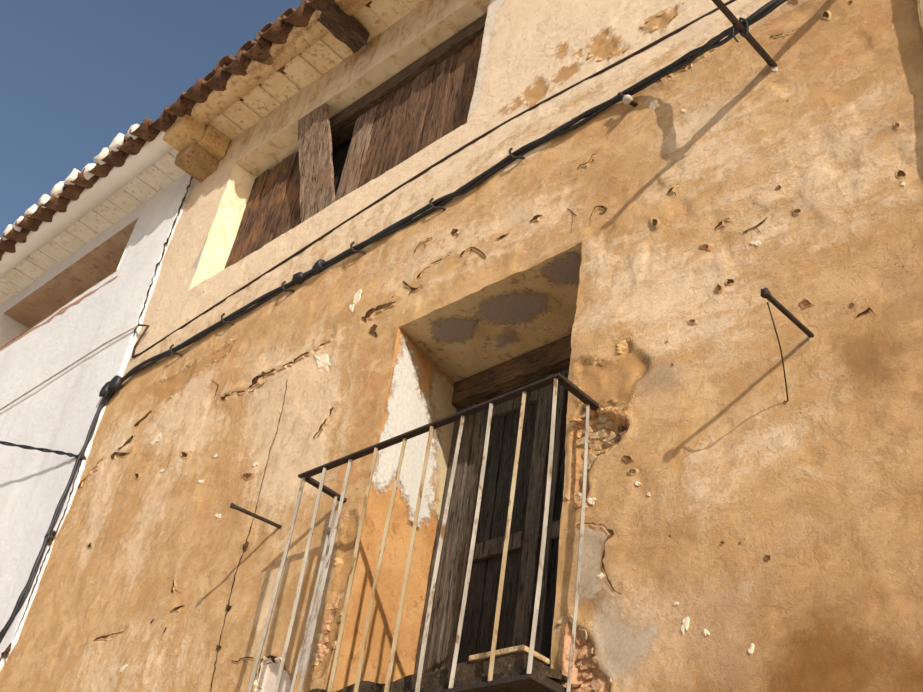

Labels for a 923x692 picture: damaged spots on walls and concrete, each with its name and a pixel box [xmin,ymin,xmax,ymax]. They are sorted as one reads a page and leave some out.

spalling [639,5,679,33]
spalling [499,26,630,115]
peeling [372,339,442,527]
crack [210,338,335,692]
spalling [299,508,361,682]
crack [576,522,622,594]
spalling [253,655,291,692]
spalling [557,615,612,692]
water stain [771,622,923,692]